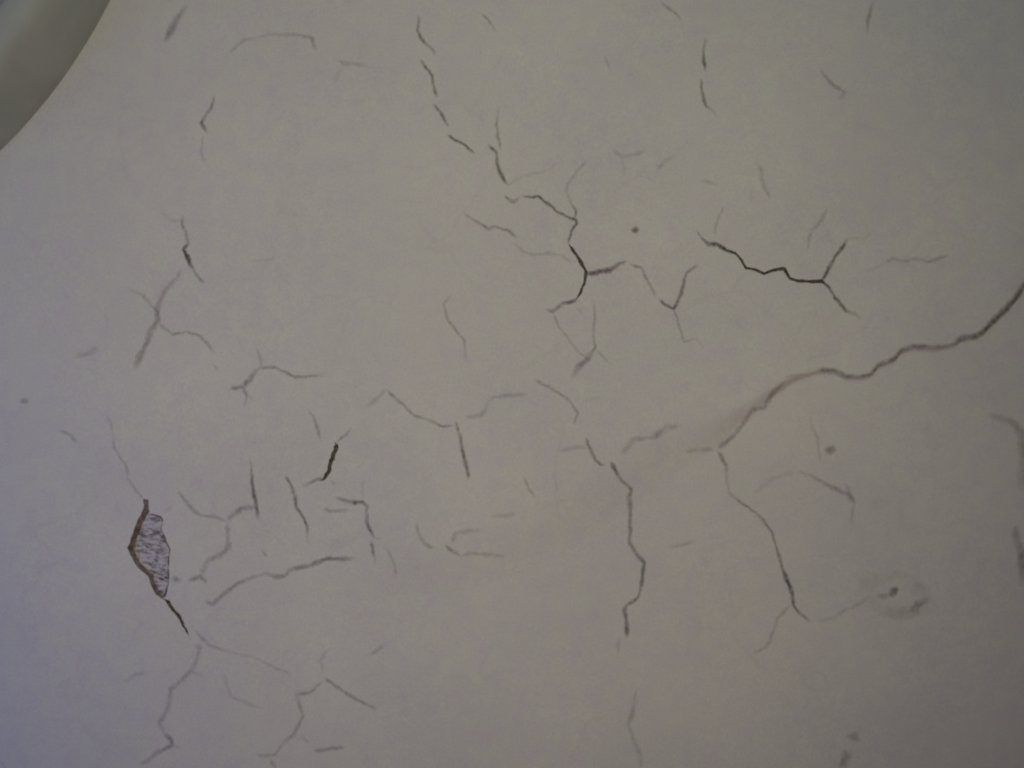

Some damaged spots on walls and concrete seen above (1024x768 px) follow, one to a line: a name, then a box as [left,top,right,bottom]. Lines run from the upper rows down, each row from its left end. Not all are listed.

crack [567,218,613,303]
crack [713,243,844,300]
crack [321,443,338,481]
flaking render [127,499,170,599]
crack [164,599,190,637]